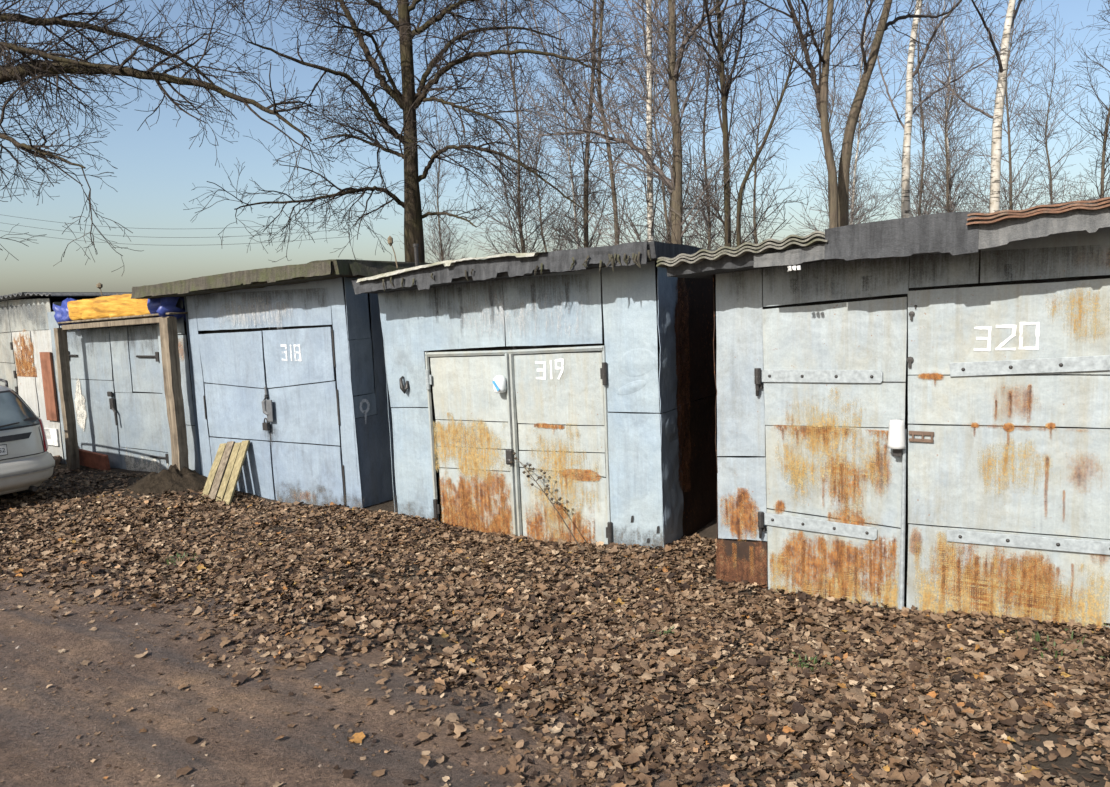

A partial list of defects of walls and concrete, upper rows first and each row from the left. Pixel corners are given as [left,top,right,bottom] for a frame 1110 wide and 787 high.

corrosion [14,329,37,377]
corrosion [433,413,601,543]
corrosion [674,278,691,492]
corrosion [776,391,889,526]
corrosion [918,373,943,382]
corrosion [982,385,1050,510]
corrosion [1051,292,1101,338]
corrosion [716,488,1109,629]